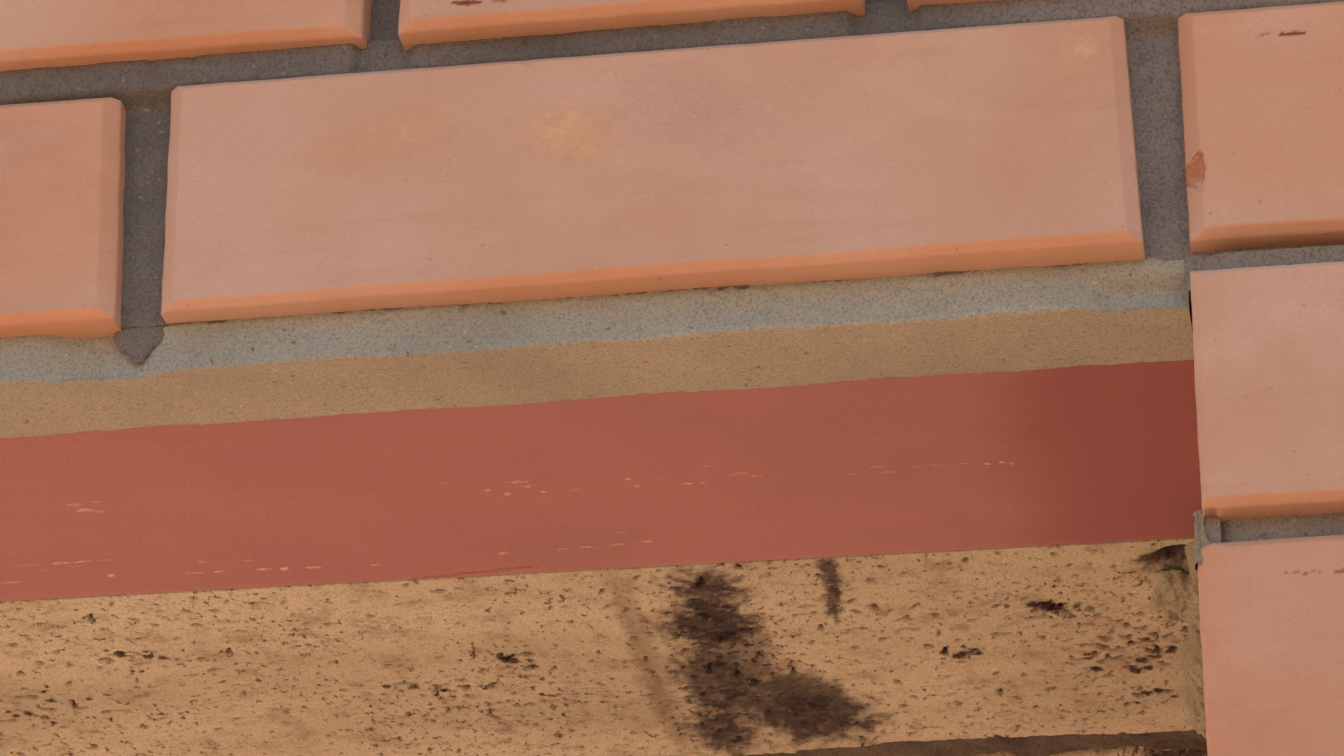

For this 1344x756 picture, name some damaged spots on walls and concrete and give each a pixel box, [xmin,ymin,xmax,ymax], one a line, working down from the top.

spalling [1186,152,1206,188]
water stain [818,559,841,618]
water stain [661,570,888,755]